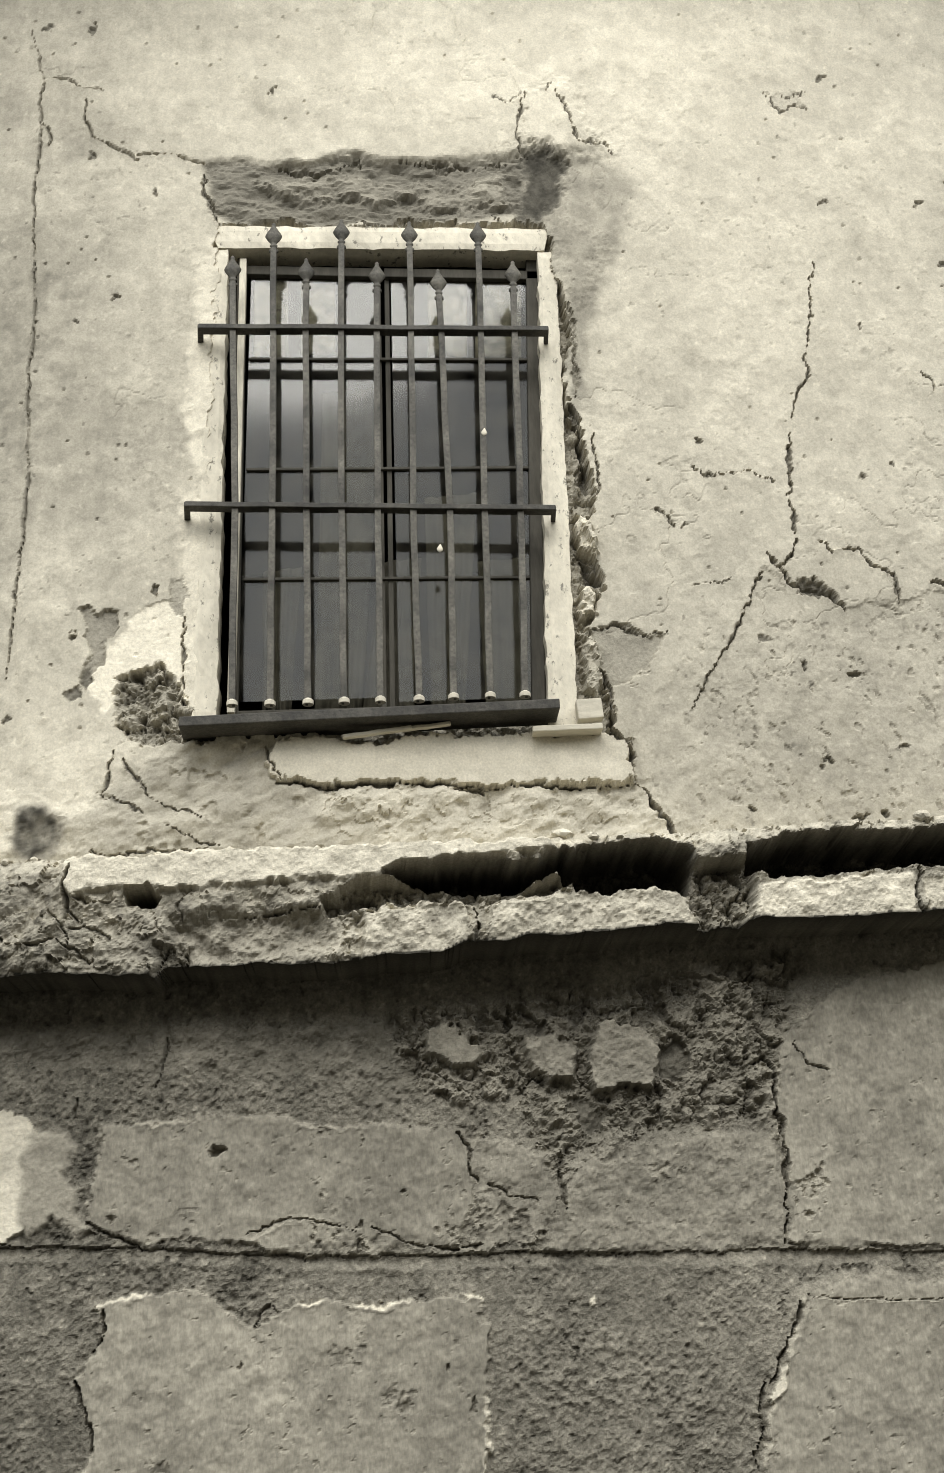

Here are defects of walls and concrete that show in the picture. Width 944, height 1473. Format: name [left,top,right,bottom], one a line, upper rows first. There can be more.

crack [276,78,615,182]
crack [345,219,393,228]
crack [486,212,500,222]
crack [4,29,222,692]
crack [683,259,944,709]
flaking render [153,151,944,989]
flaking render [63,578,192,711]
spalling [126,882,161,909]
flaking render [0,961,944,1254]
crack [751,1038,835,1247]
crack [85,1219,146,1251]
crack [244,1215,484,1256]